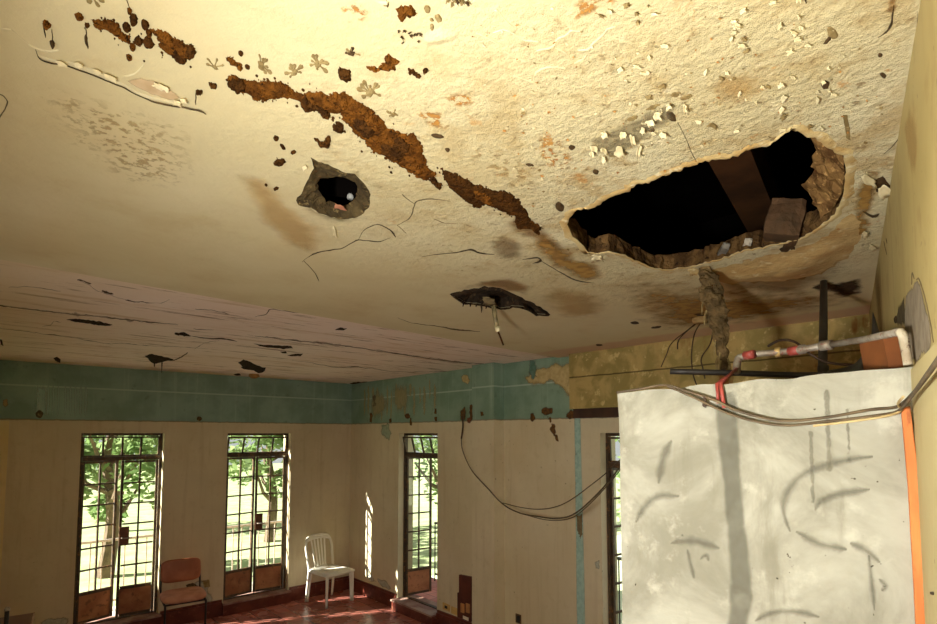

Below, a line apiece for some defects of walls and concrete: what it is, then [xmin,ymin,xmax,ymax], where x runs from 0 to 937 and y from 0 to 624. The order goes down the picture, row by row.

corrosion [84,7,197,68]
corrosion [208,50,556,246]
peeling [589,92,693,175]
spalling [801,137,845,218]
crack [302,194,457,281]
crack [423,249,495,257]
crack [0,279,227,348]
crack [256,309,483,372]
damp [648,294,707,329]
damp [725,280,860,319]
peeling [526,361,569,394]
corrosion [460,405,484,423]